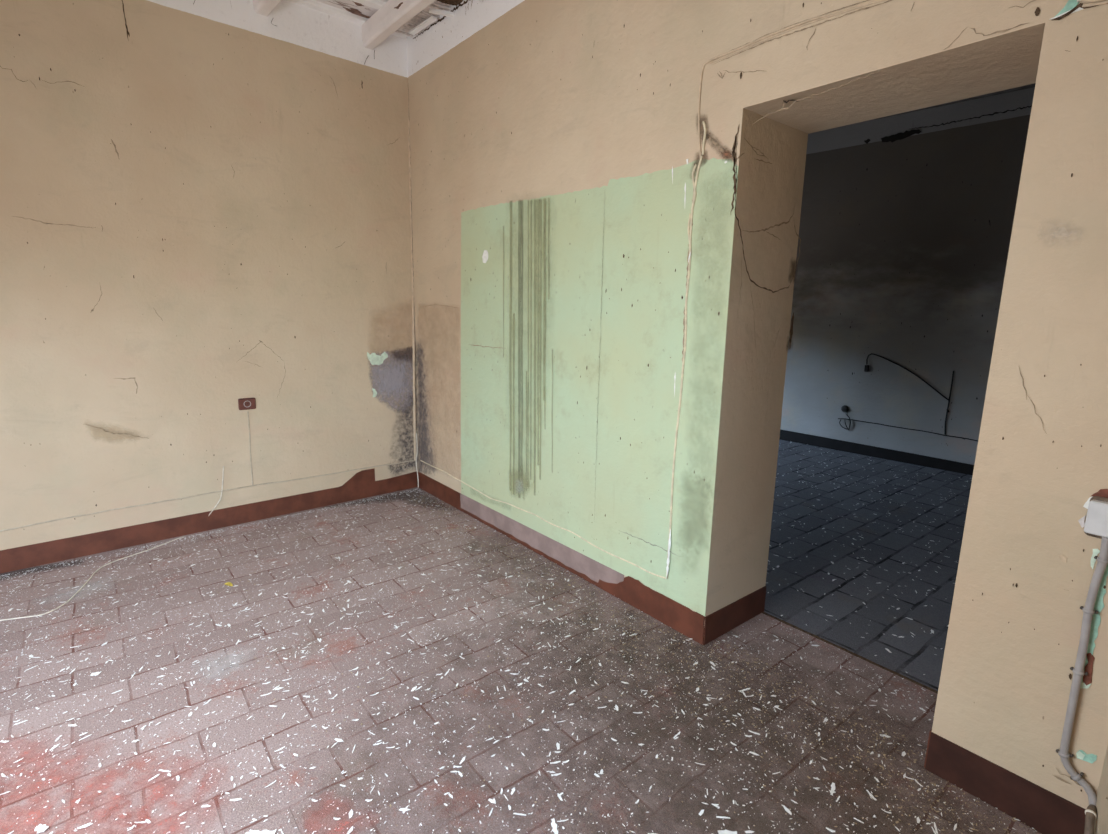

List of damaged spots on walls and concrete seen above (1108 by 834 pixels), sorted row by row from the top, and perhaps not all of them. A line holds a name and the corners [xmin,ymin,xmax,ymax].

spalling [395,0,450,37]
crack [707,70,881,356]
peeling [367,352,388,365]
peeling [0,498,377,712]
peeling [373,488,581,666]
peeling [429,718,477,806]
peeling [794,669,901,791]